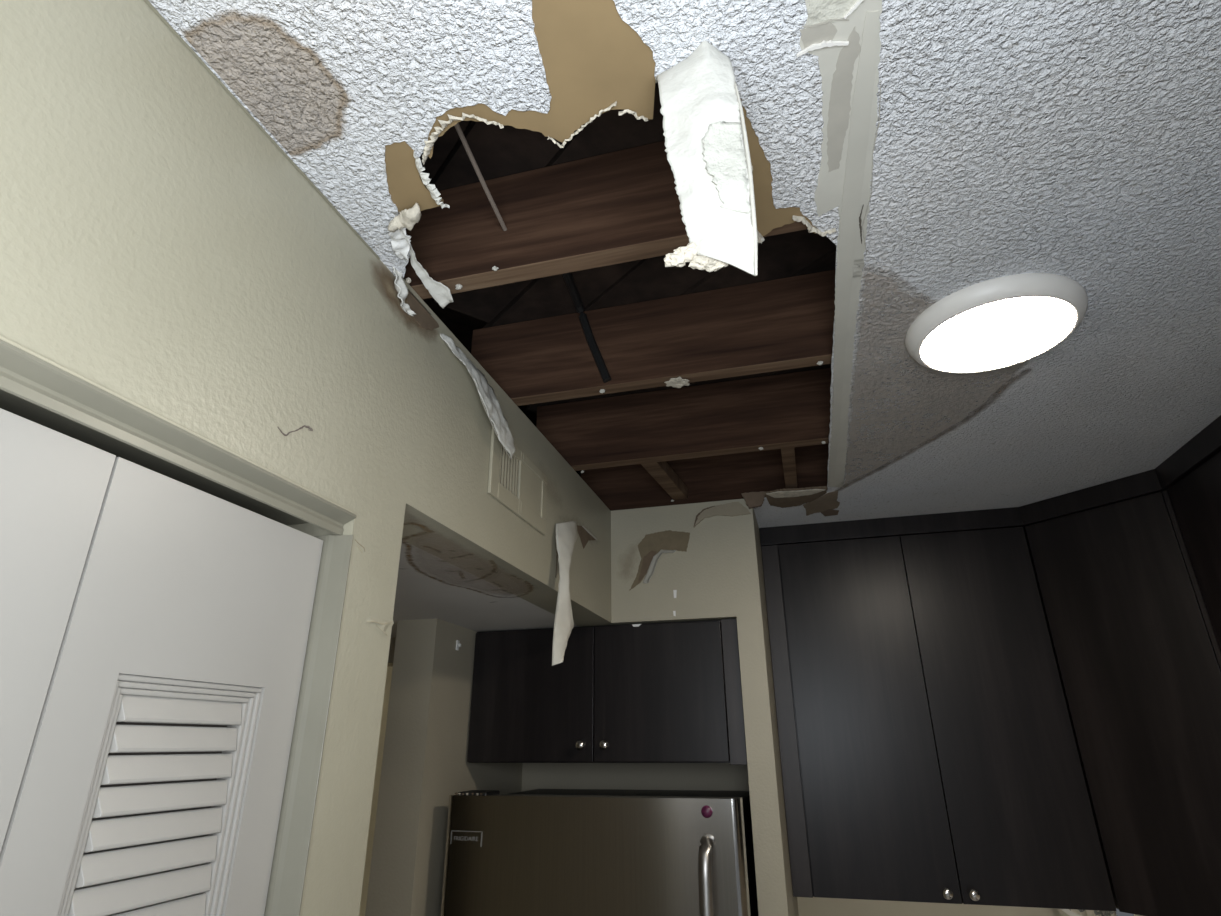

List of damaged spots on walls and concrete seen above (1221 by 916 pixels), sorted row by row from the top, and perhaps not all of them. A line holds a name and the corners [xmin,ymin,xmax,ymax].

leakage [185,12,349,155]
peeling [702,121,751,214]
peeling [797,0,883,488]
peeling [440,333,516,459]
peeling [629,502,751,591]